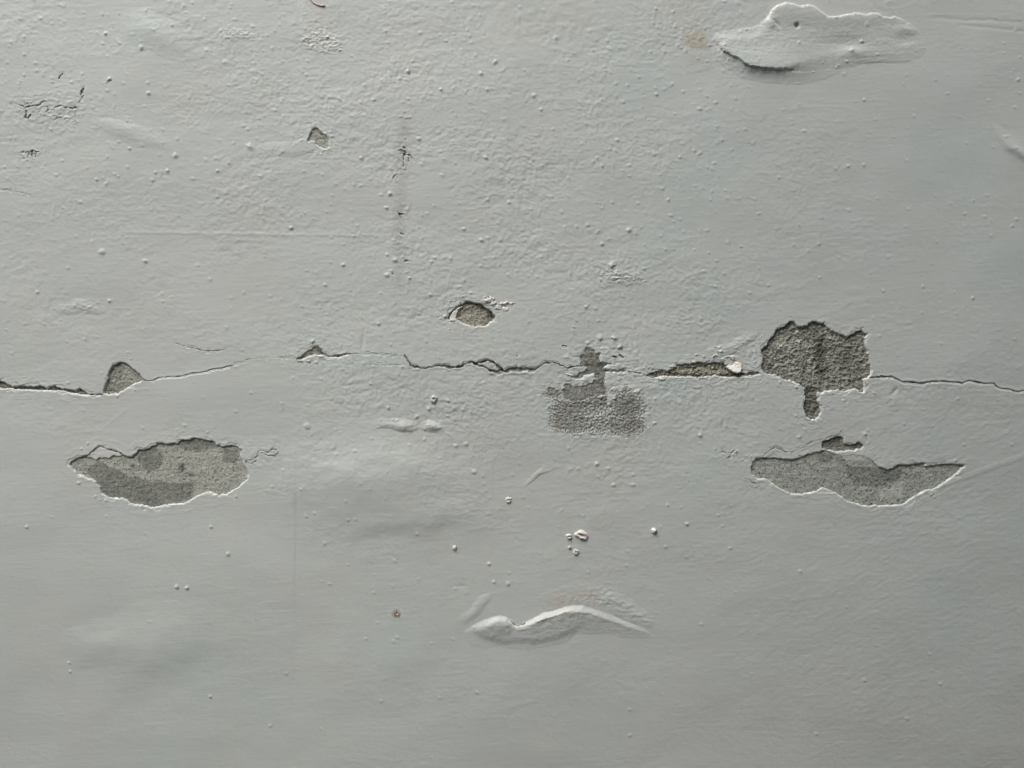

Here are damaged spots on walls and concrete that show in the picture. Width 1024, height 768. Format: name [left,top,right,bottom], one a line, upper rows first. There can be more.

peeling [297,117,339,159]
spalling [437,291,515,337]
crack [0,371,110,406]
peeling [92,352,153,405]
crack [143,340,299,382]
crack [348,342,587,378]
crack [611,352,652,380]
crack [870,373,1024,393]
peeling [534,310,975,516]
peeling [59,428,254,518]